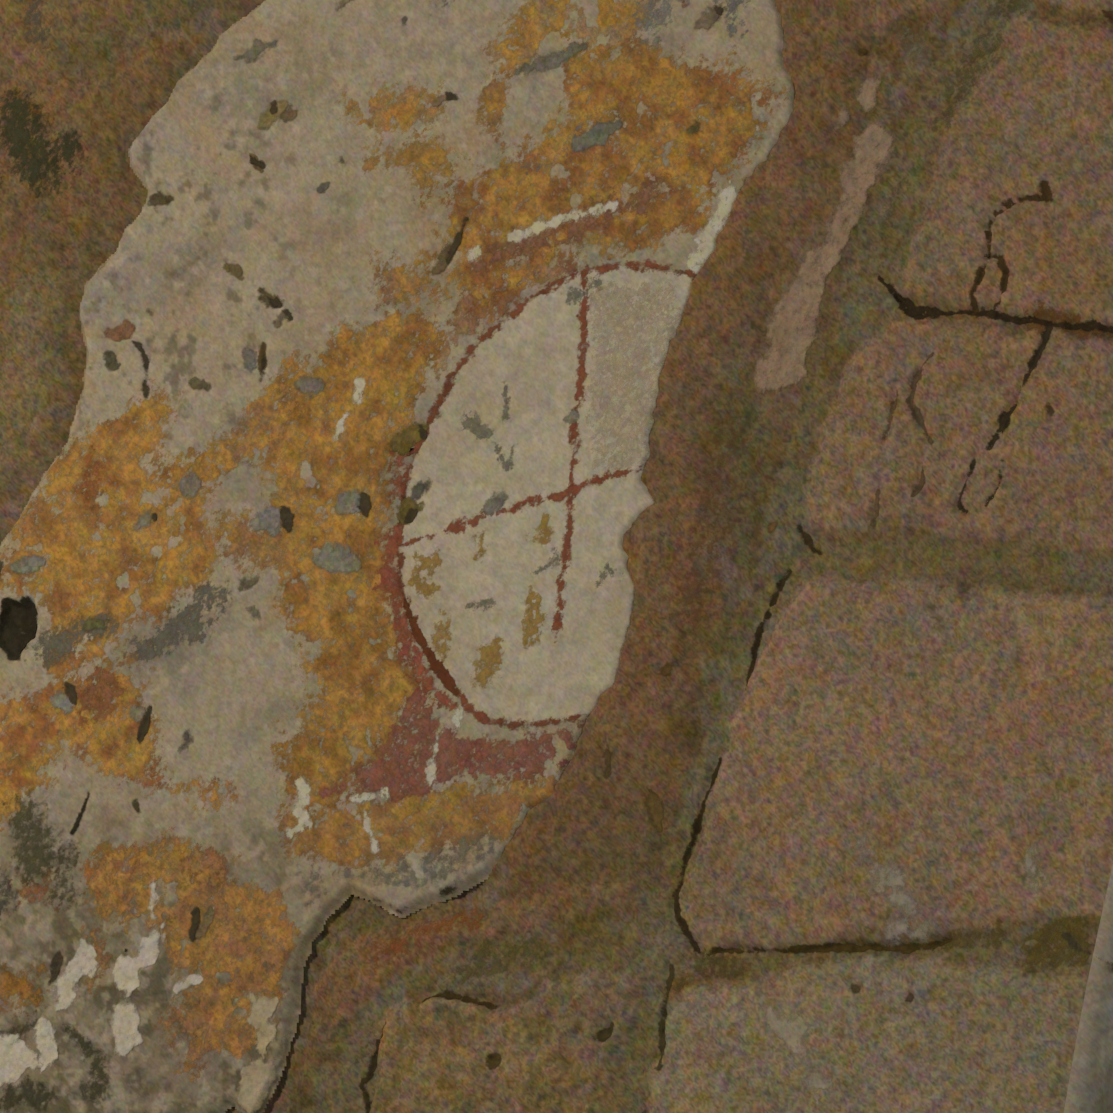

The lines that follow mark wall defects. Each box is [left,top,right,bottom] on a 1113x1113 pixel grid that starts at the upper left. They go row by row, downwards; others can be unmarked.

spalling [446,217,468,264]
spalling [269,297,292,321]
crack [878,181,1113,513]
spalling [280,506,294,533]
spalling [357,492,371,517]
crack [870,489,880,527]
spalling [137,705,151,743]
spalling [188,907,200,942]
flaking render [111,882,166,1056]
flaking render [173,974,203,994]
flaking render [0,939,98,1086]
flaking render [237,991,287,1113]